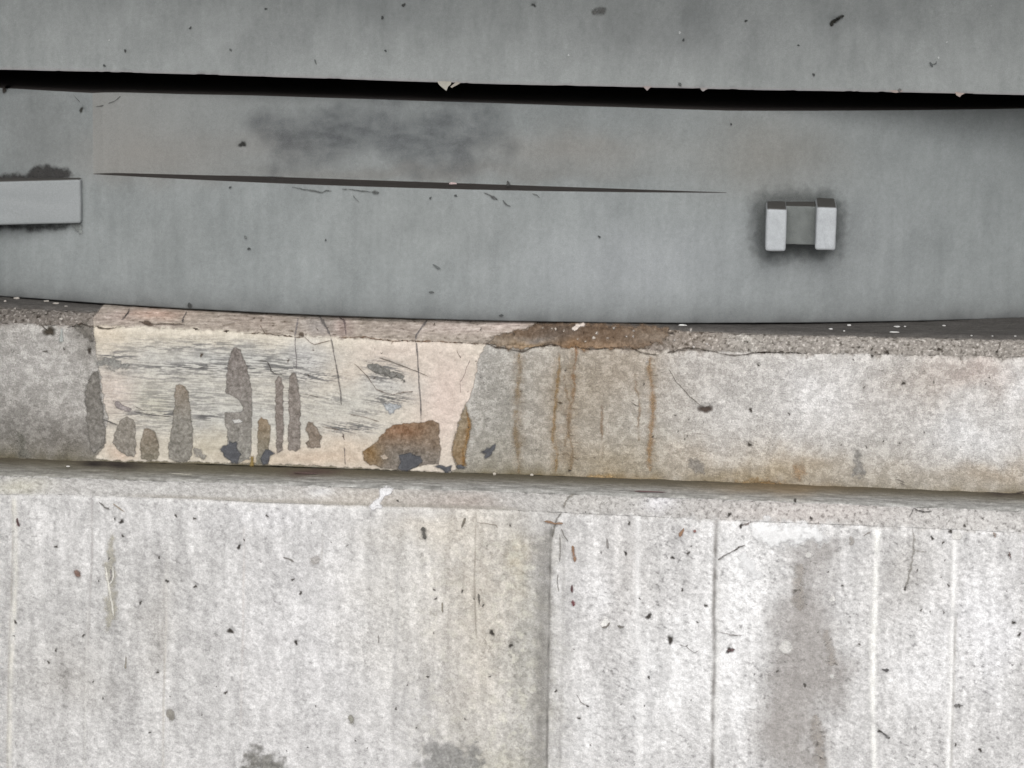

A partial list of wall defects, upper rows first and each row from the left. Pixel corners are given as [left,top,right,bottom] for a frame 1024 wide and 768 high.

peeling [93,304,537,473]
rust [490,322,669,441]
water stain [749,516,827,547]